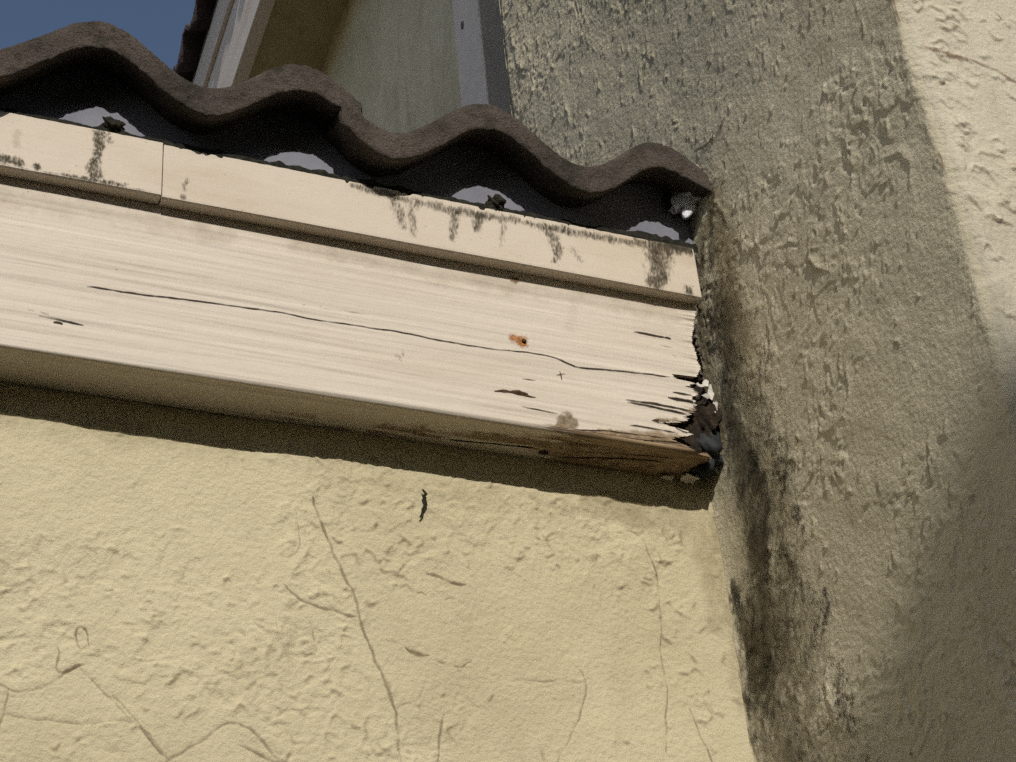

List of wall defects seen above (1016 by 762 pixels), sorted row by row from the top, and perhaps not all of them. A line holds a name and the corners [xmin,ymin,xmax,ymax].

water stain [0,130,143,190]
water stain [351,184,717,288]
crack [89,286,693,463]
peeling [696,380,718,413]
water stain [700,276,856,762]
crack [57,627,87,672]
crack [285,584,373,652]